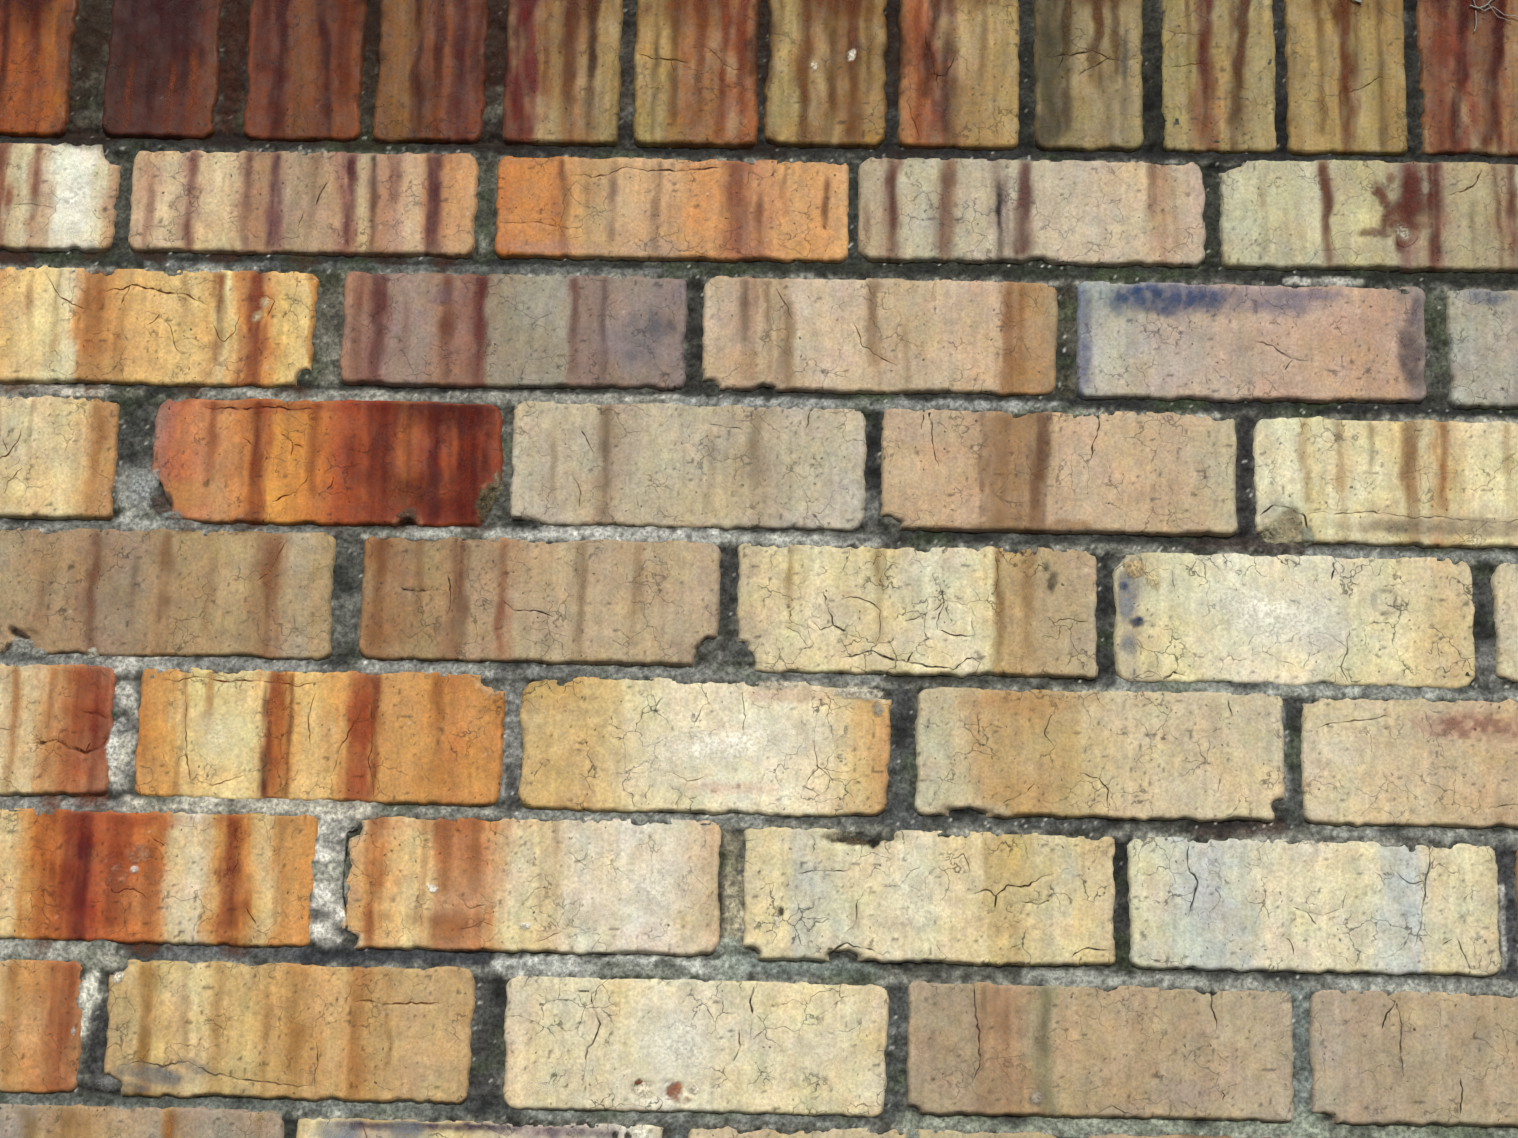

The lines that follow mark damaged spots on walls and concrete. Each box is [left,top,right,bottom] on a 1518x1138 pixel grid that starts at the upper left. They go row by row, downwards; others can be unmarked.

rust [262,0,289,87]
rust [412,0,479,108]
rust [1319,165,1333,230]
rust [1361,165,1440,254]
rust [251,402,262,480]
rust [457,406,489,516]
crack [789,590,980,671]
crack [805,700,841,790]
rust [52,817,123,903]
crack [802,868,918,951]
crack [953,853,1047,907]